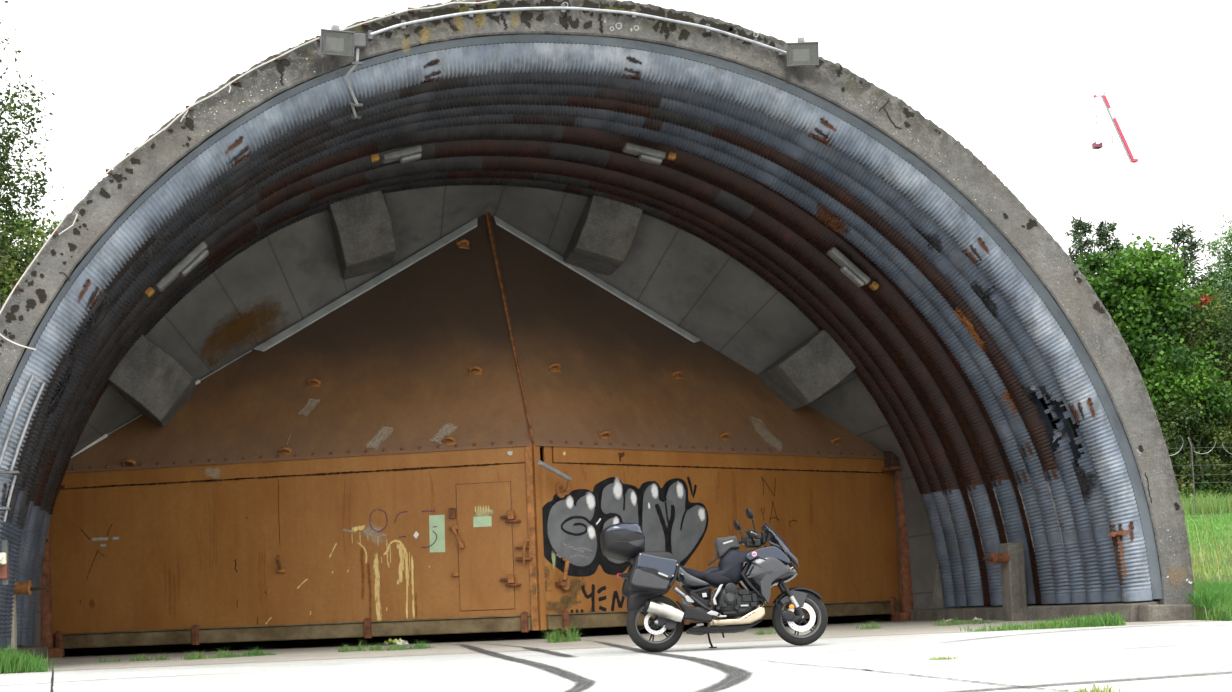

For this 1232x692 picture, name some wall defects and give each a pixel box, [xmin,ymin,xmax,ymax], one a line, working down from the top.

rust [808,118,836,146]
rust [962,237,989,264]
rust [1109,521,1134,585]